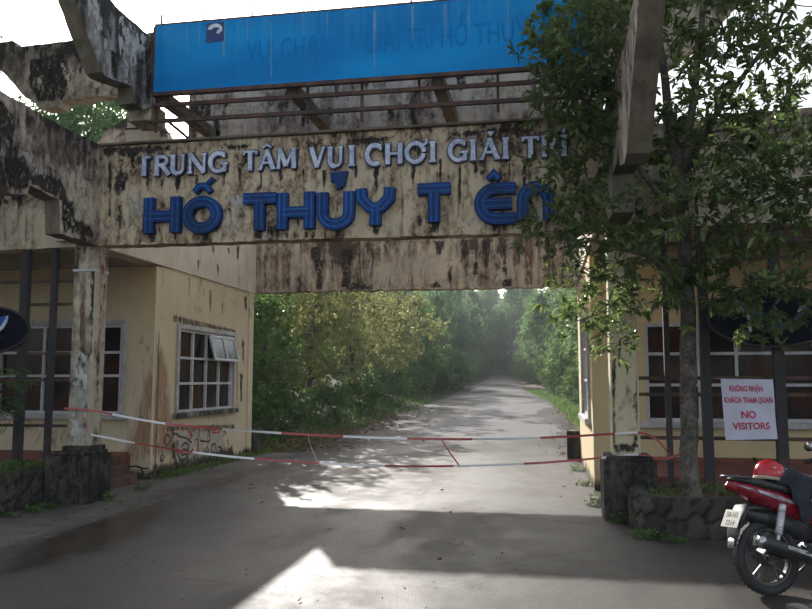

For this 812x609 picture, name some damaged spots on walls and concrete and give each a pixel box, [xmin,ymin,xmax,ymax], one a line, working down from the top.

water stain [4,47,71,102]
water stain [191,105,248,150]
water stain [347,136,390,146]
water stain [452,126,520,137]
water stain [0,100,93,238]
water stain [432,215,445,255]
water stain [306,247,329,290]
water stain [340,248,381,290]
water stain [460,240,490,278]
water stain [502,239,512,286]
peeling [70,350,90,445]
corrosion [129,351,174,455]